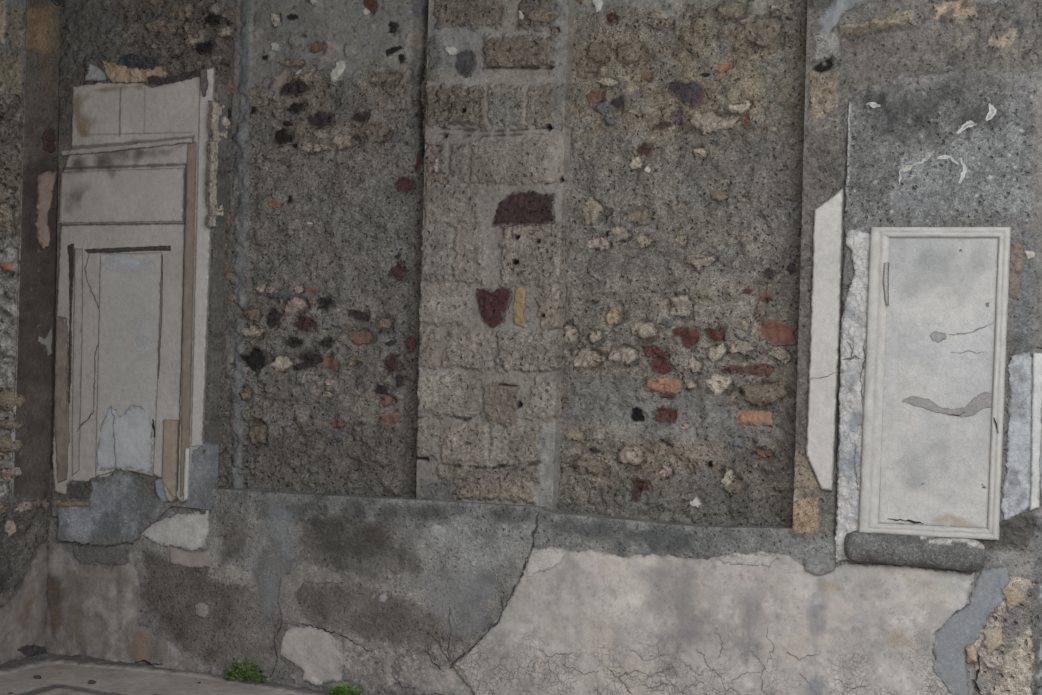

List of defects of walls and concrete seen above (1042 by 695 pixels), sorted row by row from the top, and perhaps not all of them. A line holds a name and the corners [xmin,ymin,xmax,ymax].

peeling [0,540,197,672]
crack [270,623,375,678]
crack [427,511,540,672]
crack [539,627,863,695]
peeling [390,546,1036,695]